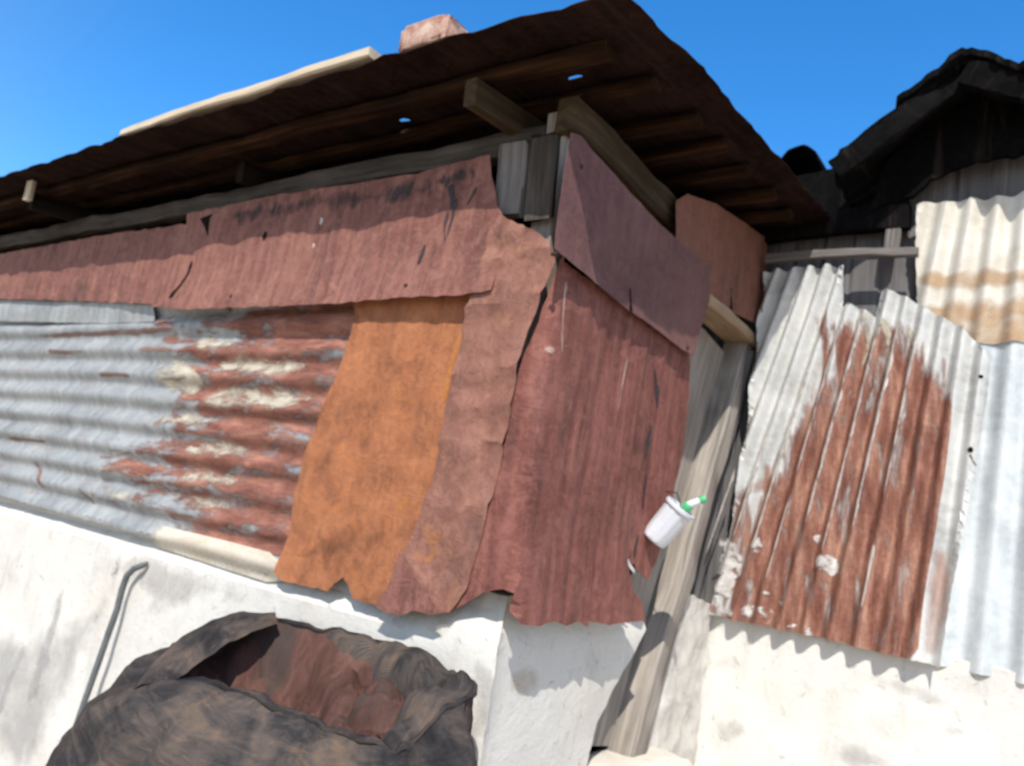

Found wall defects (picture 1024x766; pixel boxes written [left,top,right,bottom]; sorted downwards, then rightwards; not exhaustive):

rust [40,302,355,582]
rust [706,310,953,659]
rust [922,271,1024,286]
rust [931,302,1024,344]